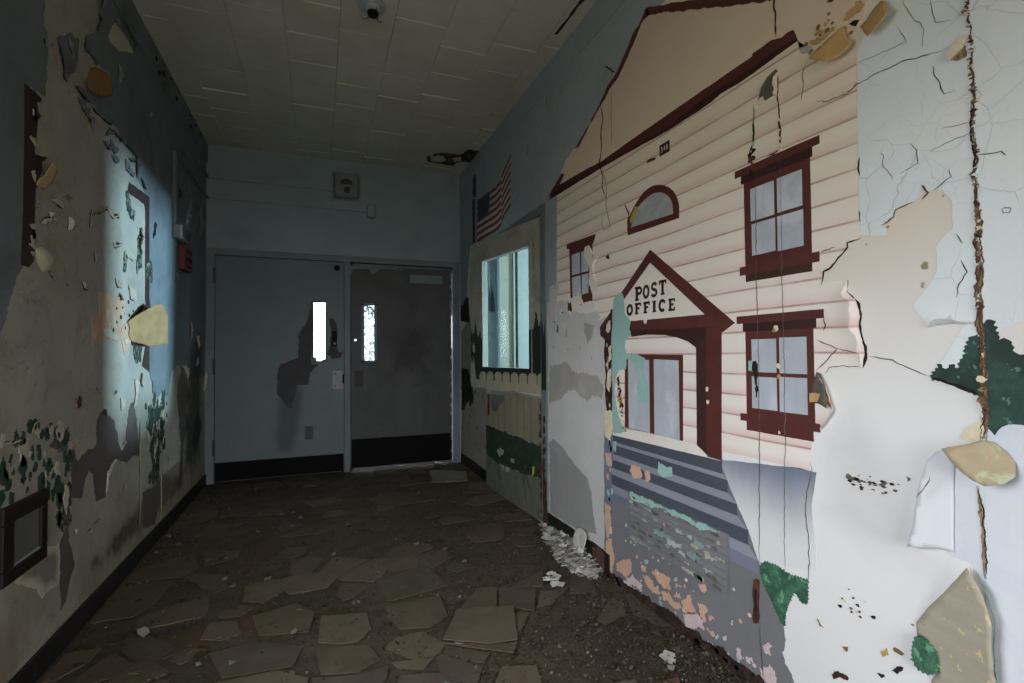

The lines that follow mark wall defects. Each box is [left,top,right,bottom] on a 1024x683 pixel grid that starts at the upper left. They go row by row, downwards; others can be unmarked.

peeling [44,0,154,190]
peeling [41,198,76,230]
peeling [82,278,168,356]
peeling [113,222,157,262]
peeling [426,149,479,166]
crack [747,0,1011,578]
peeling [927,318,974,328]
peeling [0,321,208,611]
spalling [122,245,777,683]
peeling [877,567,997,683]